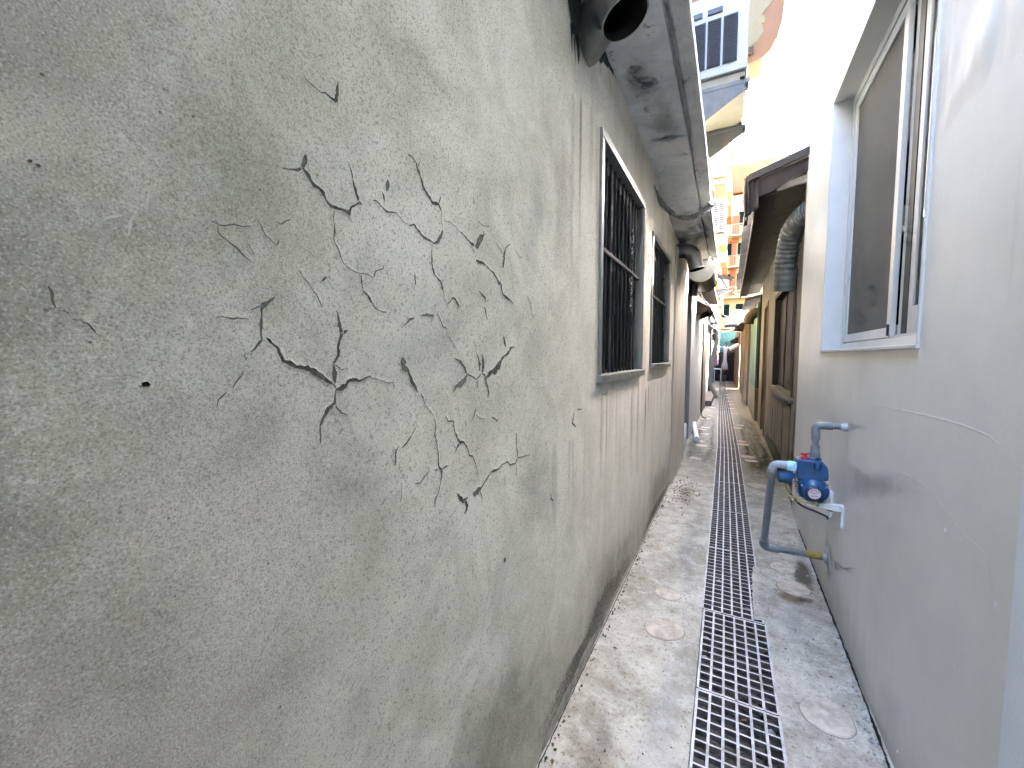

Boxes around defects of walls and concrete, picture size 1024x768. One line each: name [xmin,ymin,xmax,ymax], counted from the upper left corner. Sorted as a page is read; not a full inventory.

crack [304,75,342,108]
crack [38,285,103,335]
crack [210,151,534,515]